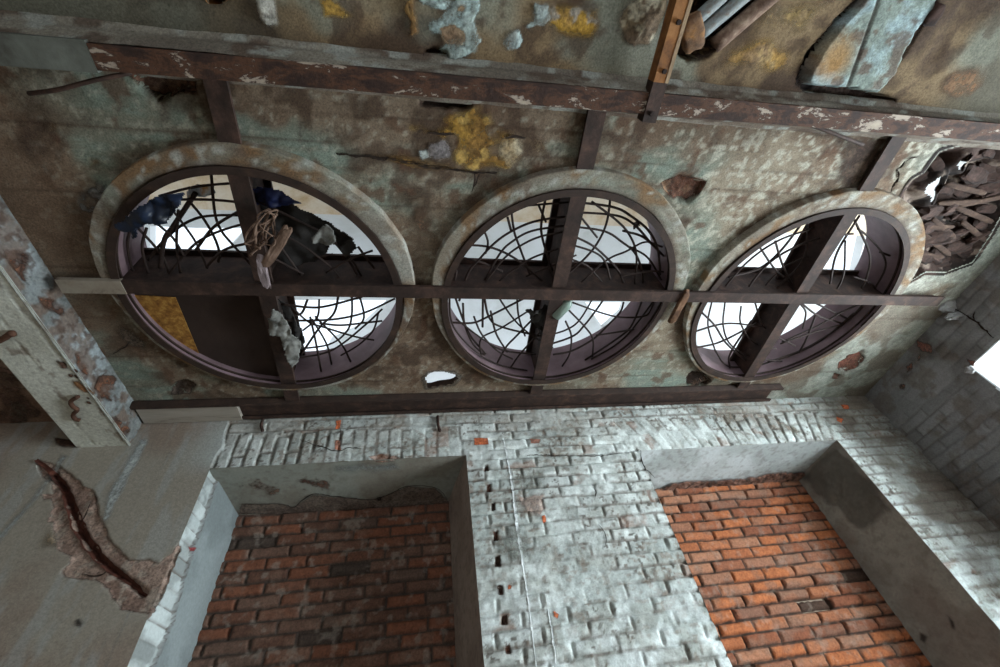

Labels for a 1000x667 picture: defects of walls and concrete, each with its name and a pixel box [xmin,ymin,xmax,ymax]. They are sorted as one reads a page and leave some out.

peeling [419,0,481,60]
rust [726,41,789,71]
leakage [419,108,521,170]
crack [505,133,526,141]
crack [336,153,497,192]
spalling [660,175,706,199]
spalling [915,149,1000,267]
rust [9,252,28,282]
rust [38,297,64,315]
rust [57,354,117,404]
spalling [832,351,864,379]
flaking render [34,459,196,619]